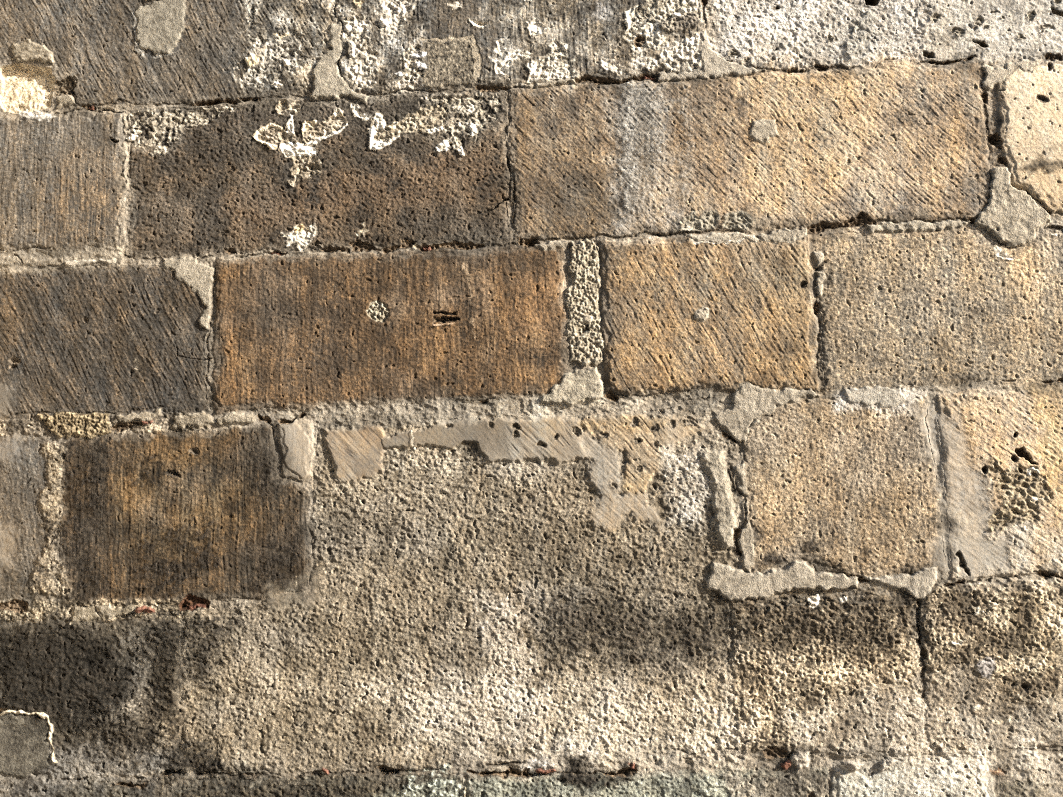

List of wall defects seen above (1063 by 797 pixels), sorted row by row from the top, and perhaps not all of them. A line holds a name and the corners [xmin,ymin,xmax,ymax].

spalling [233,0,501,187]
spalling [488,18,579,83]
spalling [595,53,623,75]
spalling [623,0,701,72]
spalling [110,105,237,156]
crack [946,570,1063,588]
damp [152,642,188,718]
crack [918,605,927,698]